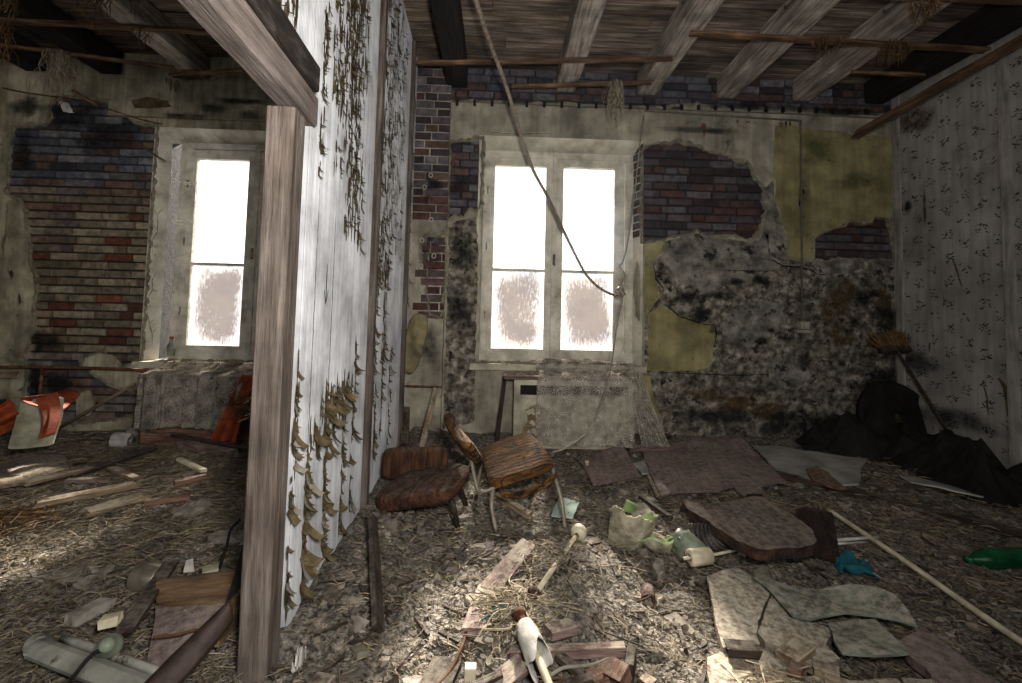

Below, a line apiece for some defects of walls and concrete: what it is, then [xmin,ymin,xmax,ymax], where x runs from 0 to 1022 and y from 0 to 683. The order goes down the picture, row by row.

flaking render [3,94,172,427]
peeling [286,381,392,607]
peeling [354,328,397,401]
flaking render [396,63,897,439]